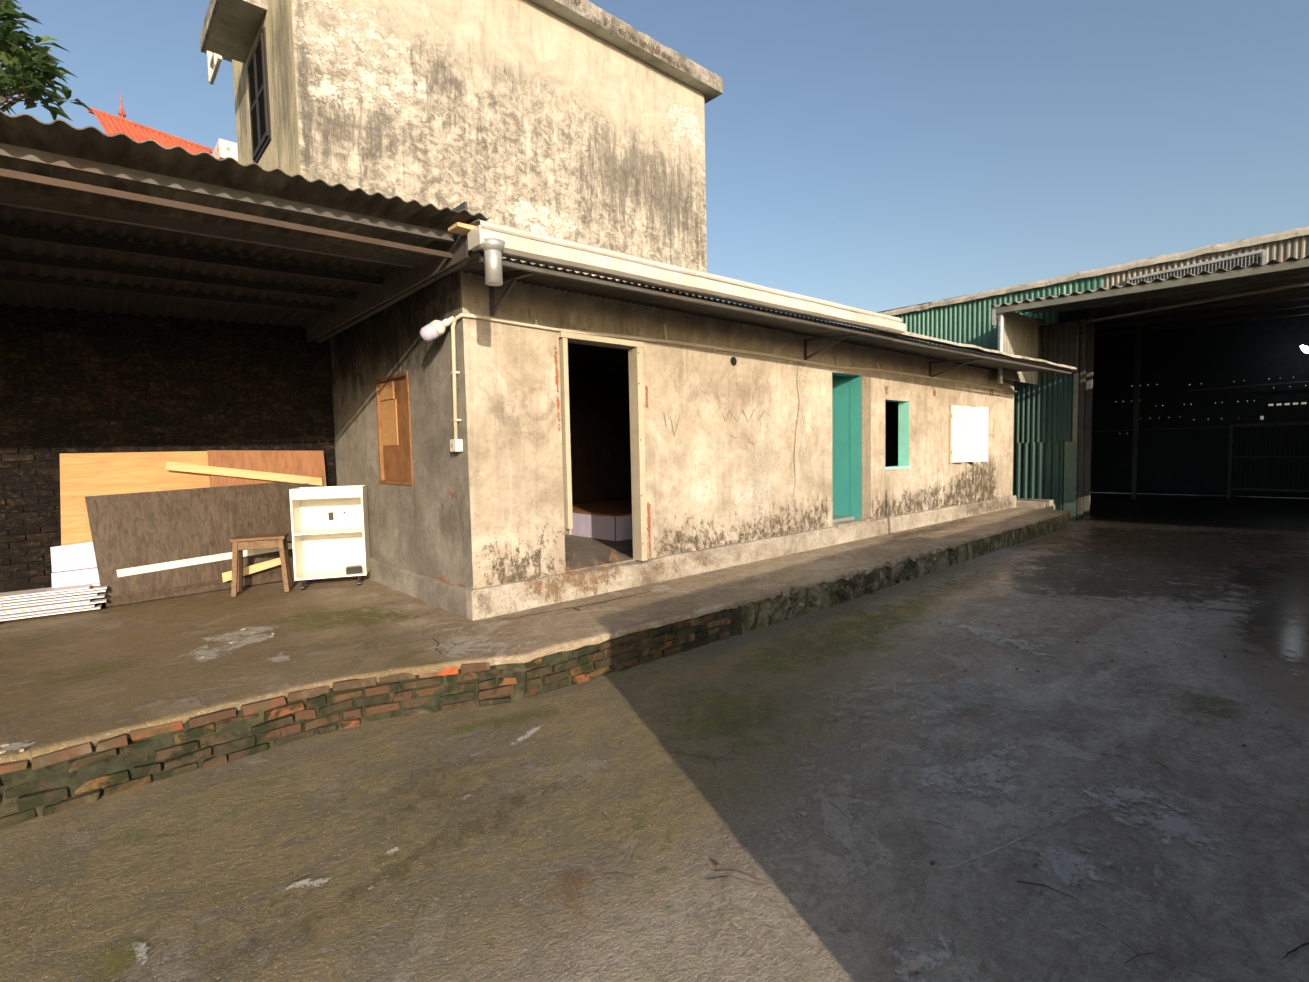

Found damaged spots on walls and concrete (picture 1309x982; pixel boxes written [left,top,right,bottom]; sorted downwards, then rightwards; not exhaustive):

leakage [591,17,690,74]
leakage [272,3,381,162]
leakage [566,119,701,247]
leakage [872,456,996,519]
leakage [478,531,566,585]
leakage [647,497,828,558]